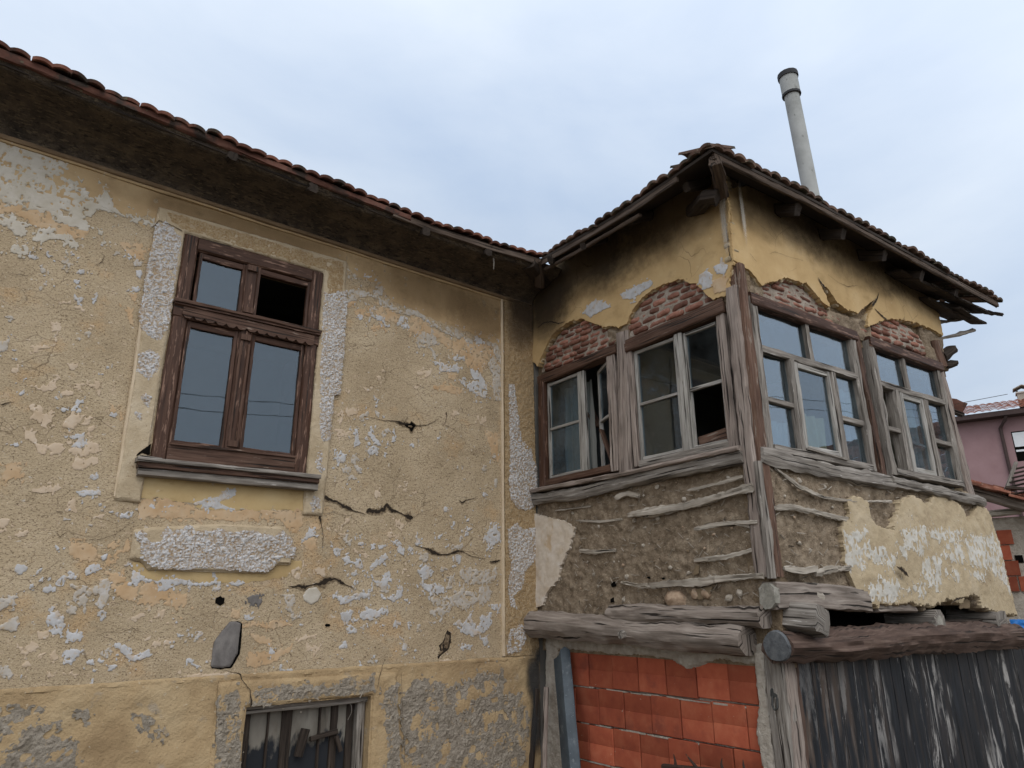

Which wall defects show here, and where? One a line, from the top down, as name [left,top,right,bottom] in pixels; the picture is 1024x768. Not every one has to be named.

peeling [0,142,182,380]
peeling [694,257,728,300]
crack [818,275,887,320]
crack [371,412,458,455]
spalling [0,268,772,768]
crack [318,495,500,563]
spalling [770,467,1011,609]
crack [273,576,353,594]